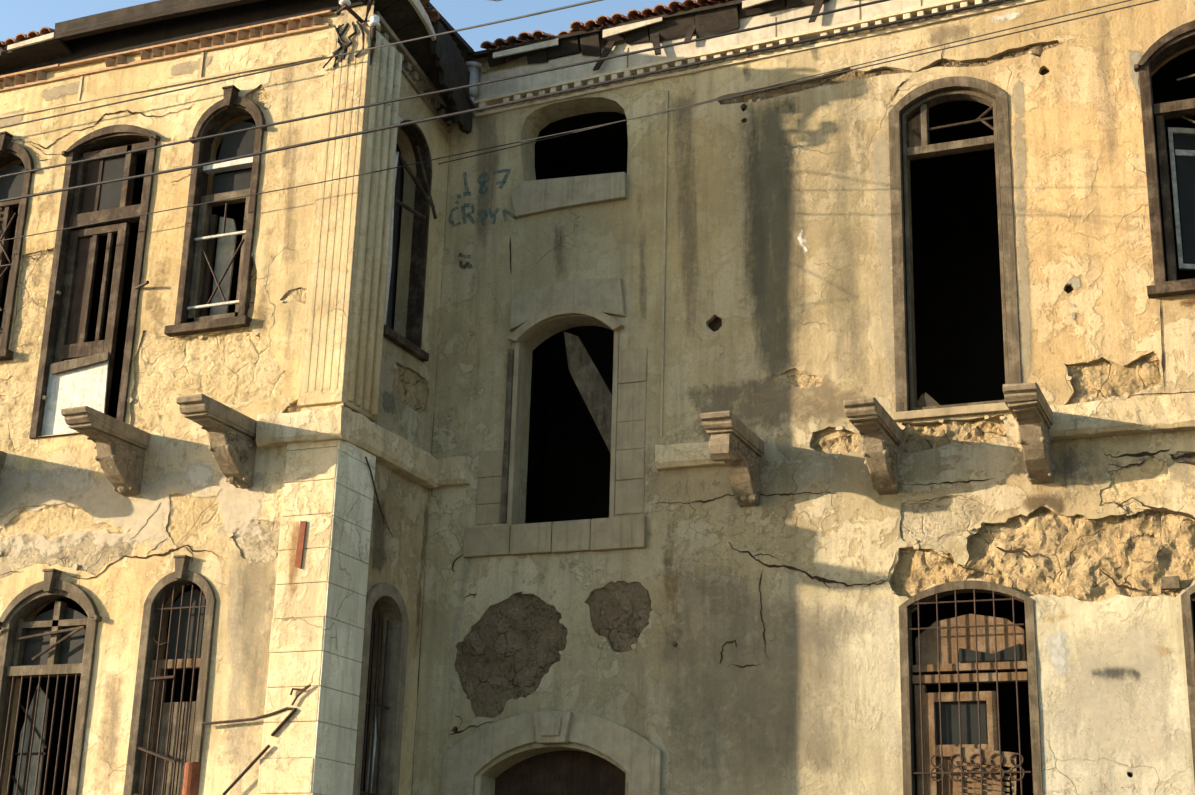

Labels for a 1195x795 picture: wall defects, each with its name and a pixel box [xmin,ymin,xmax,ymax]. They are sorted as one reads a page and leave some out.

crack [11,99,198,161]
damp [690,104,856,442]
spalling [1065,352,1162,405]
spalling [900,392,1007,453]
spalling [0,505,139,578]
spalling [891,449,1195,602]
spalling [585,580,652,653]
spalling [455,592,568,718]